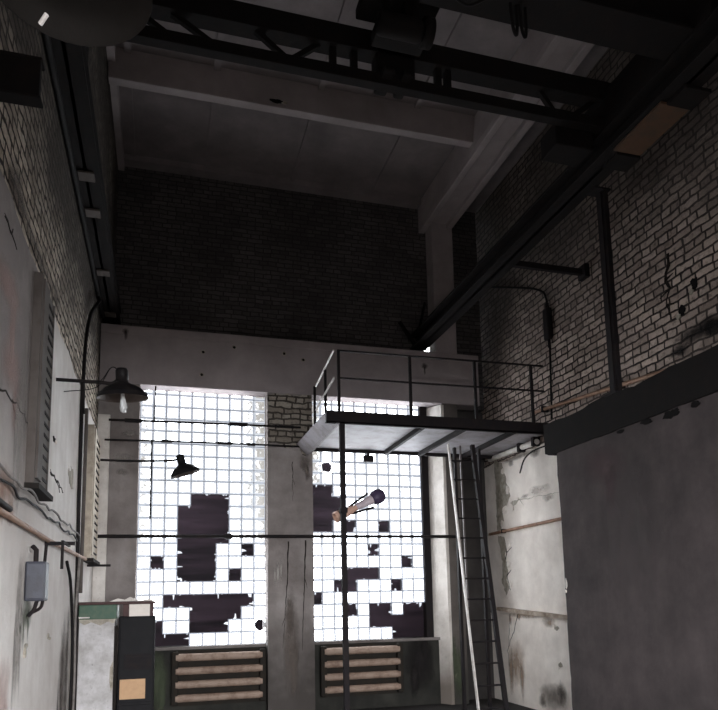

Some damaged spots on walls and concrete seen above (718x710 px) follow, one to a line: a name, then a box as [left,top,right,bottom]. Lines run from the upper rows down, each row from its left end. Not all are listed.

crack [4,213,17,250]
crack [0,388,28,424]
flaking render [494,461,519,595]
crack [282,540,307,650]
water stain [510,652,523,690]
water stain [541,687,565,705]